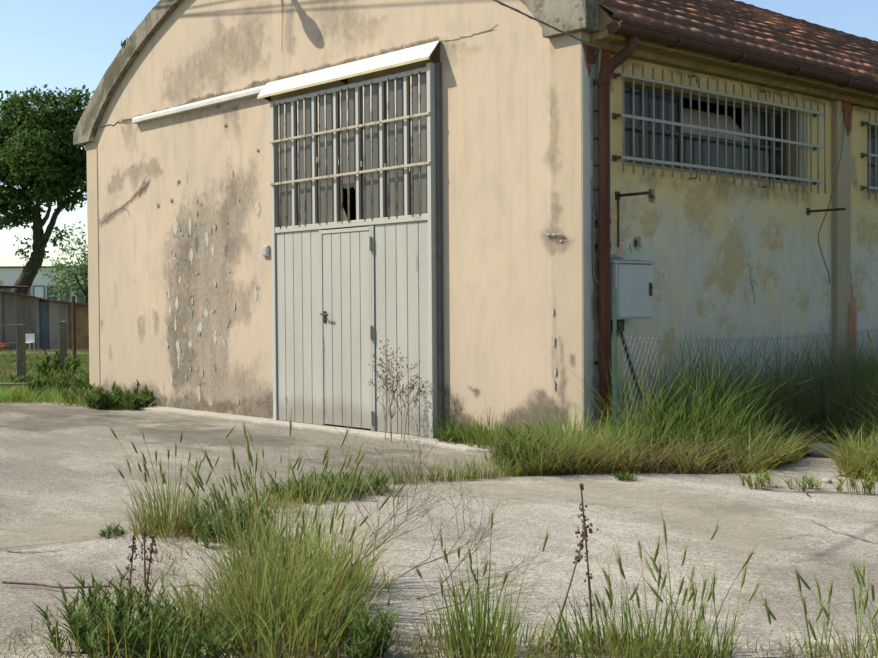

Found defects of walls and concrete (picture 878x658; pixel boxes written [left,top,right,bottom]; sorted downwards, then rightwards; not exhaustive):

crack [441,25,497,42]
rust [842,101,853,135]
crack [99,176,148,224]
rust [848,279,857,377]
leakage [132,389,273,418]
leakage [444,389,473,440]
leakage [502,367,566,433]